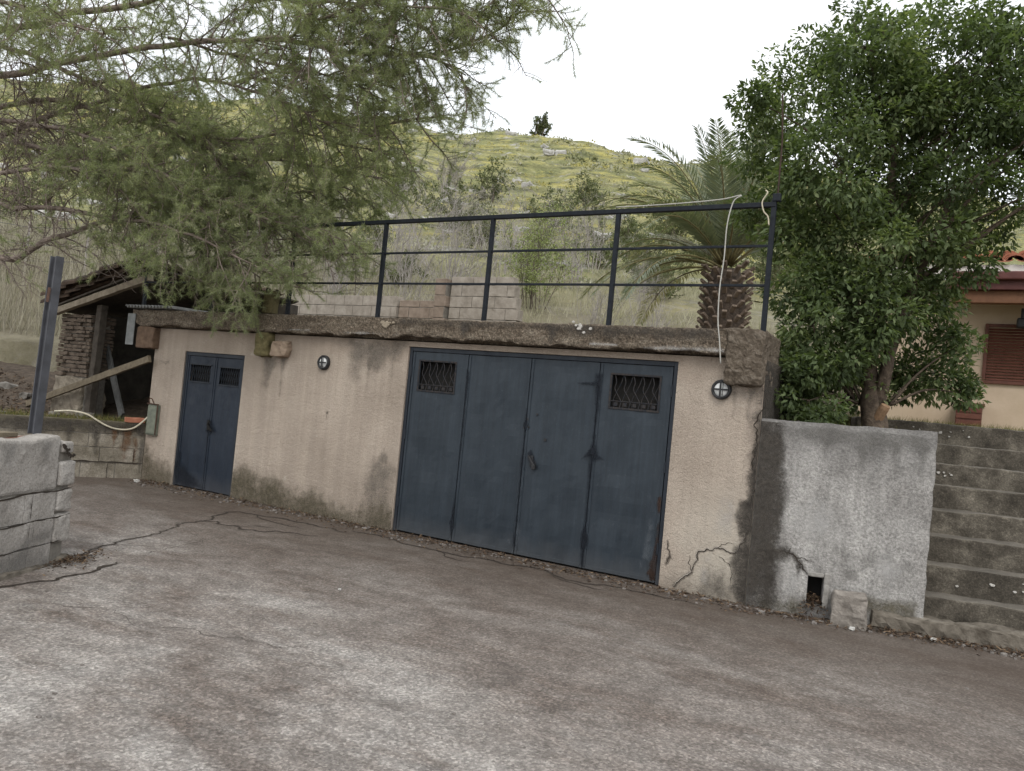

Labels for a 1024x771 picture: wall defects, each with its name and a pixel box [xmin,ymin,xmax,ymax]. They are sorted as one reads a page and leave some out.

crack [0,487,71,563]
crack [666,394,812,587]
damp [731,360,801,609]